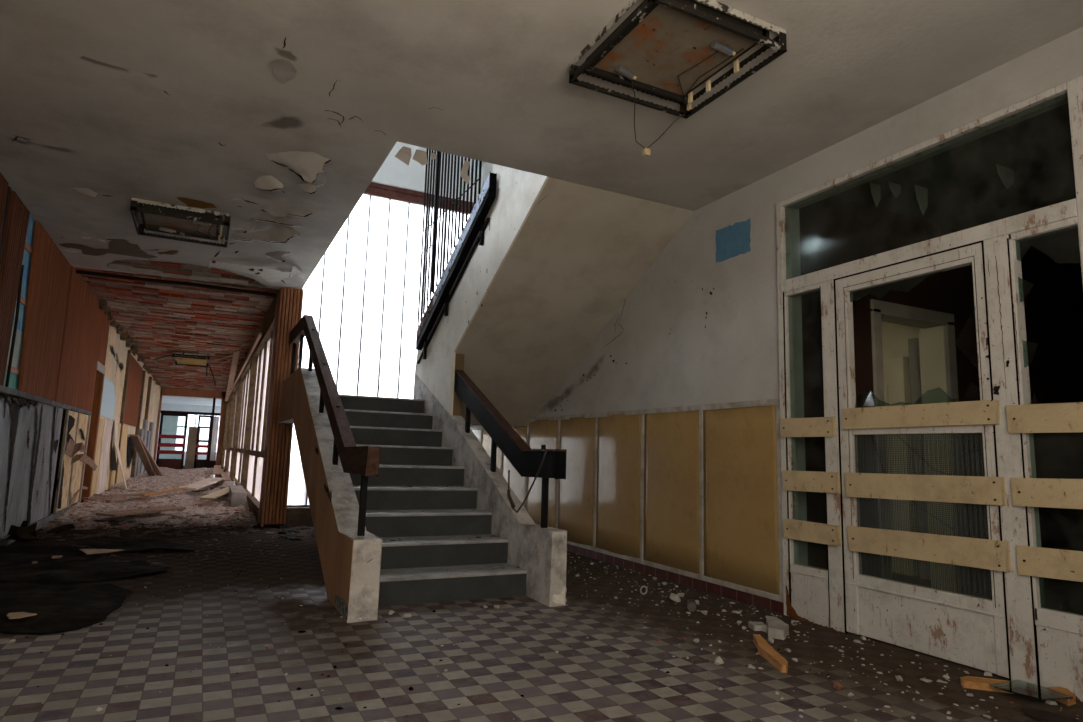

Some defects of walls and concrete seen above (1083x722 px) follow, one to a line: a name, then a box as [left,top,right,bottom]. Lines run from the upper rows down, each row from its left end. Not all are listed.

peeling [254,151,331,195]
peeling [106,206,306,289]